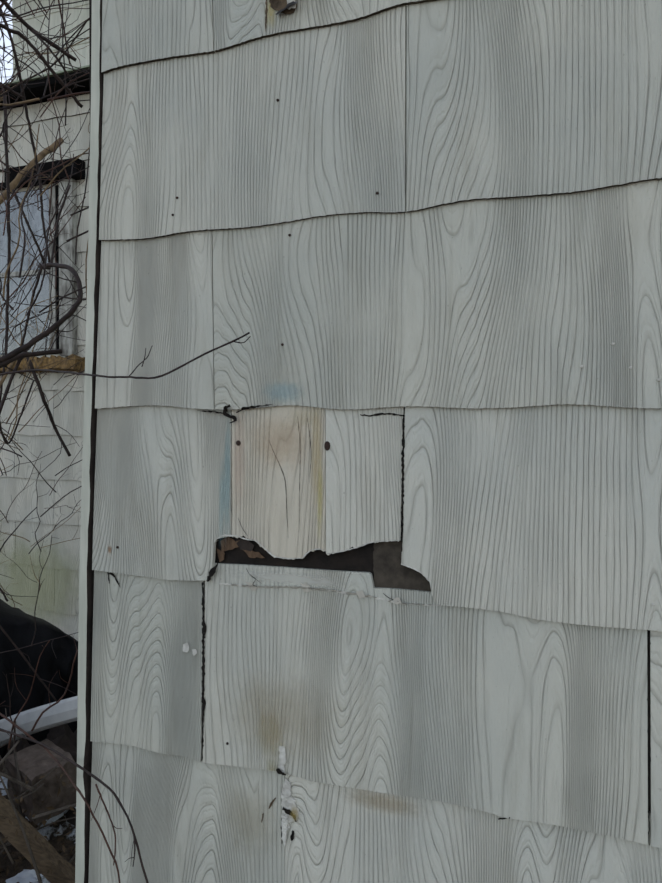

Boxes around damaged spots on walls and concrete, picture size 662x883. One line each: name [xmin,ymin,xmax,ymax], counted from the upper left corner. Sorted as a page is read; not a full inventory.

spalling [215,534,442,606]
crack [201,563,218,761]
spalling [261,746,299,846]